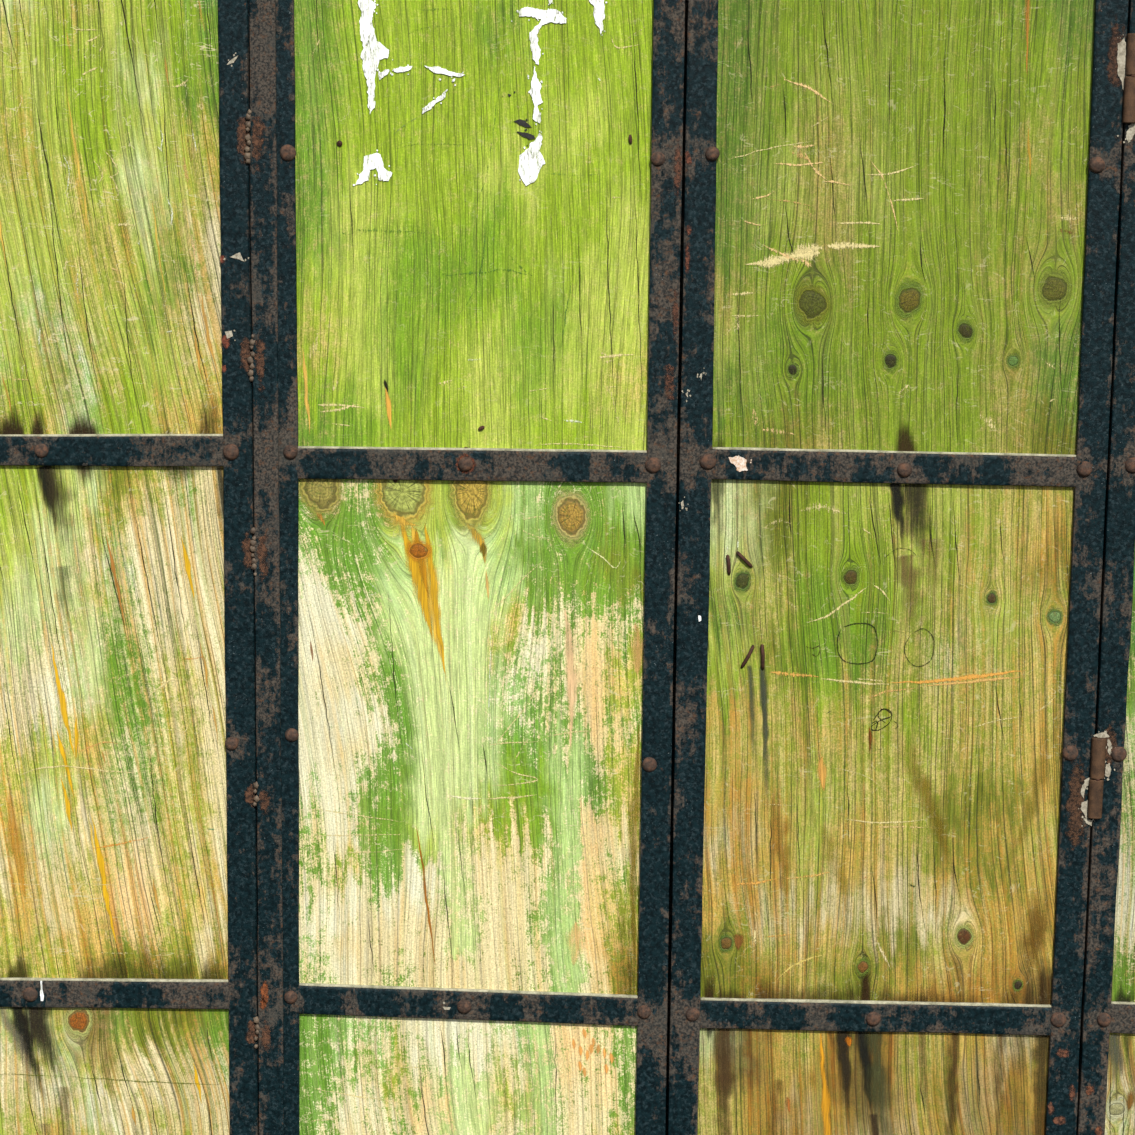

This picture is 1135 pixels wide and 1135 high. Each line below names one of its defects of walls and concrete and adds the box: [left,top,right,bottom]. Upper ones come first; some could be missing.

peeling [358,0,464,114]
peeling [511,0,566,186]
peeling [589,0,607,38]
rust [1107,18,1126,87]
peeling [353,150,392,186]
rust [221,335,265,390]
rust [1065,761,1087,845]
leakage [0,1007,54,1086]
rust [246,982,270,1048]
leakage [707,1028,732,1135]
leakage [820,1031,888,1135]
leakage [949,1033,957,1131]